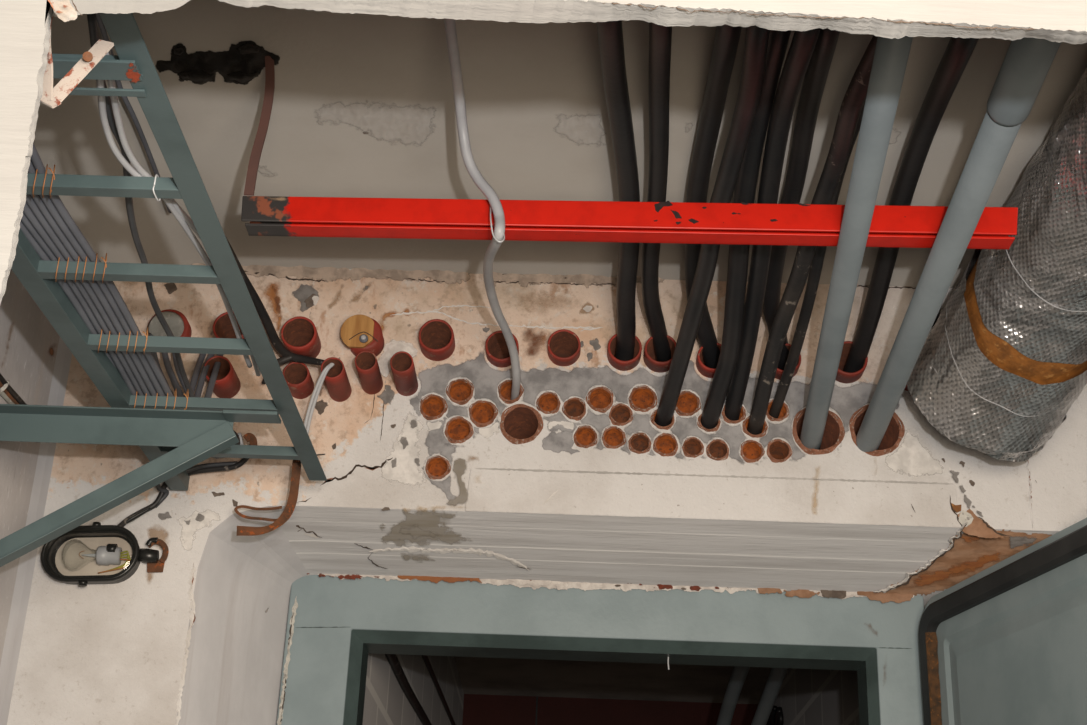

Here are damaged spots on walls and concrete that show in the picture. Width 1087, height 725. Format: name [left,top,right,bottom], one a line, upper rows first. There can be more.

spalling [48,0,78,22]
spalling [292,284,319,312]
crack [296,394,392,538]
peeling [382,413,442,486]
peeling [479,422,499,438]
peeling [548,421,574,430]
water stain [380,458,475,561]
spalling [307,430,1052,603]
corrosion [925,632,942,725]